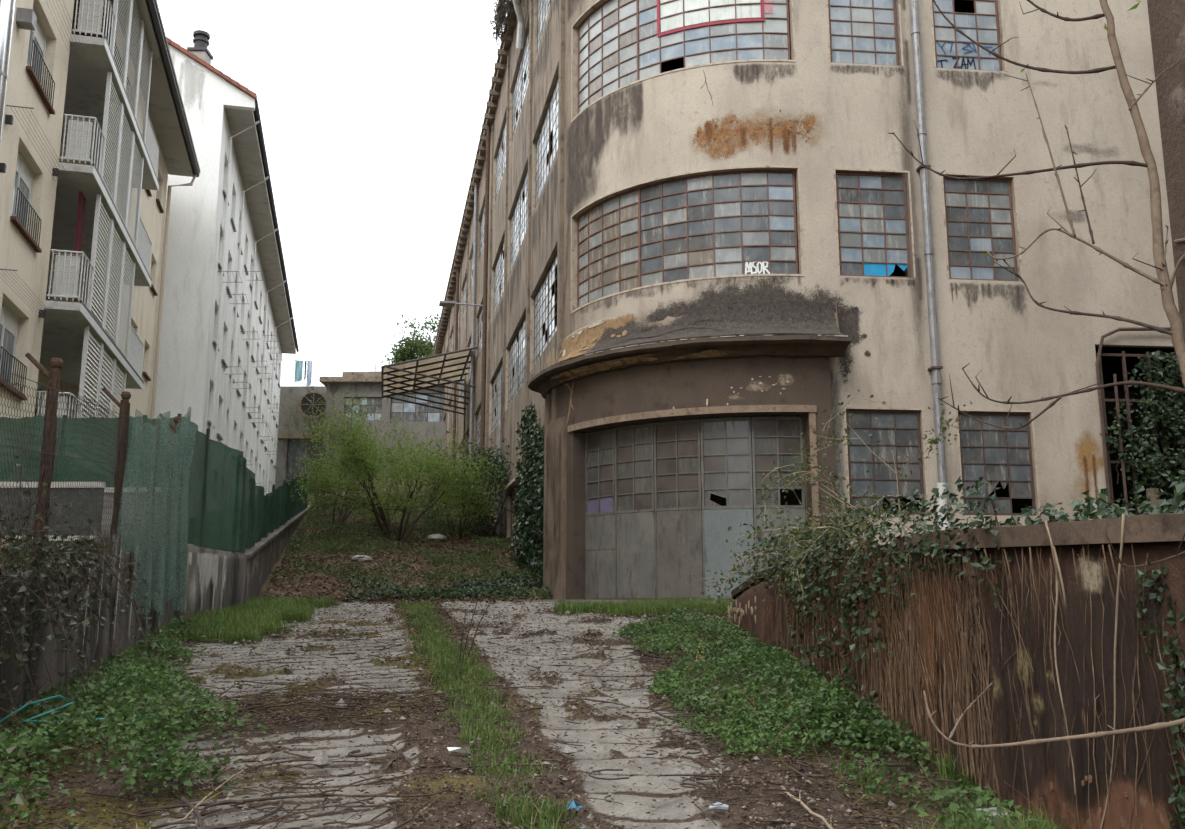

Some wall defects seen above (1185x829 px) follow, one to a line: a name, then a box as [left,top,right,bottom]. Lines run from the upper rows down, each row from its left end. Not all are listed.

damp [939,70,1001,89]
damp [533,83,643,244]
damp [493,252,537,339]
damp [951,283,1025,310]
damp [546,276,871,533]
corrosion [1078,435,1103,499]